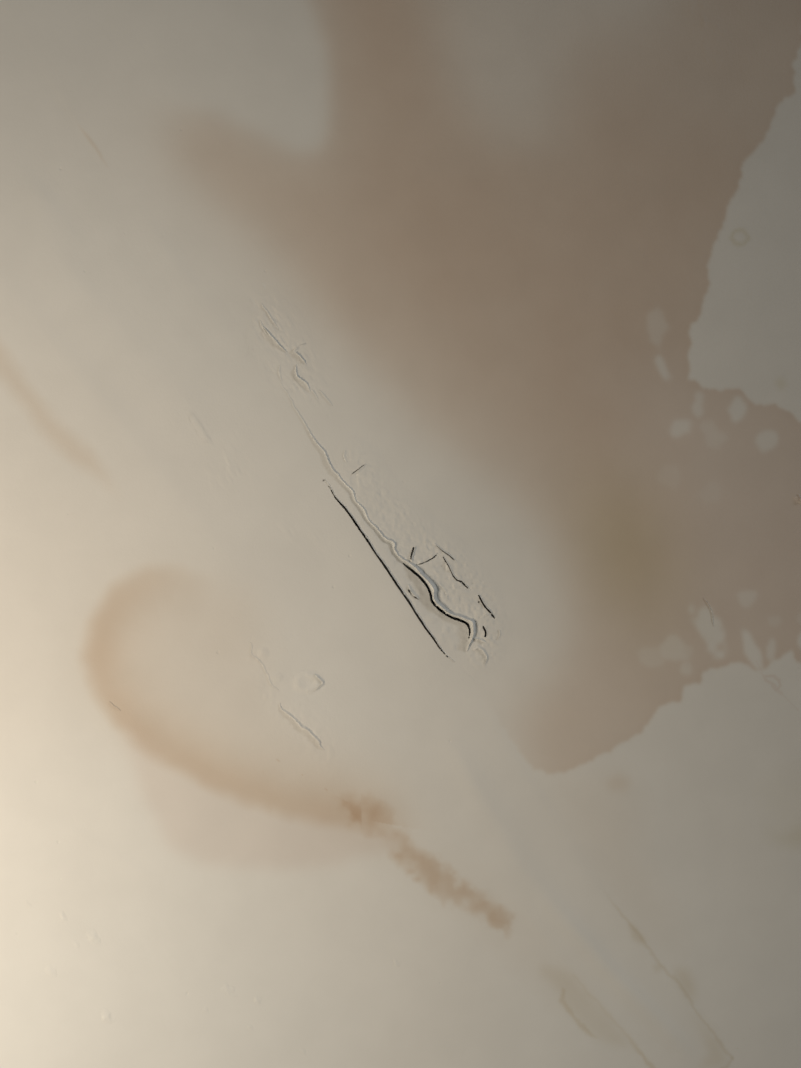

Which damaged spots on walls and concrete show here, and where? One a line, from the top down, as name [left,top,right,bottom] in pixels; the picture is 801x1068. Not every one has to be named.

leakage [0,450,659,1068]
leakage [149,0,801,778]